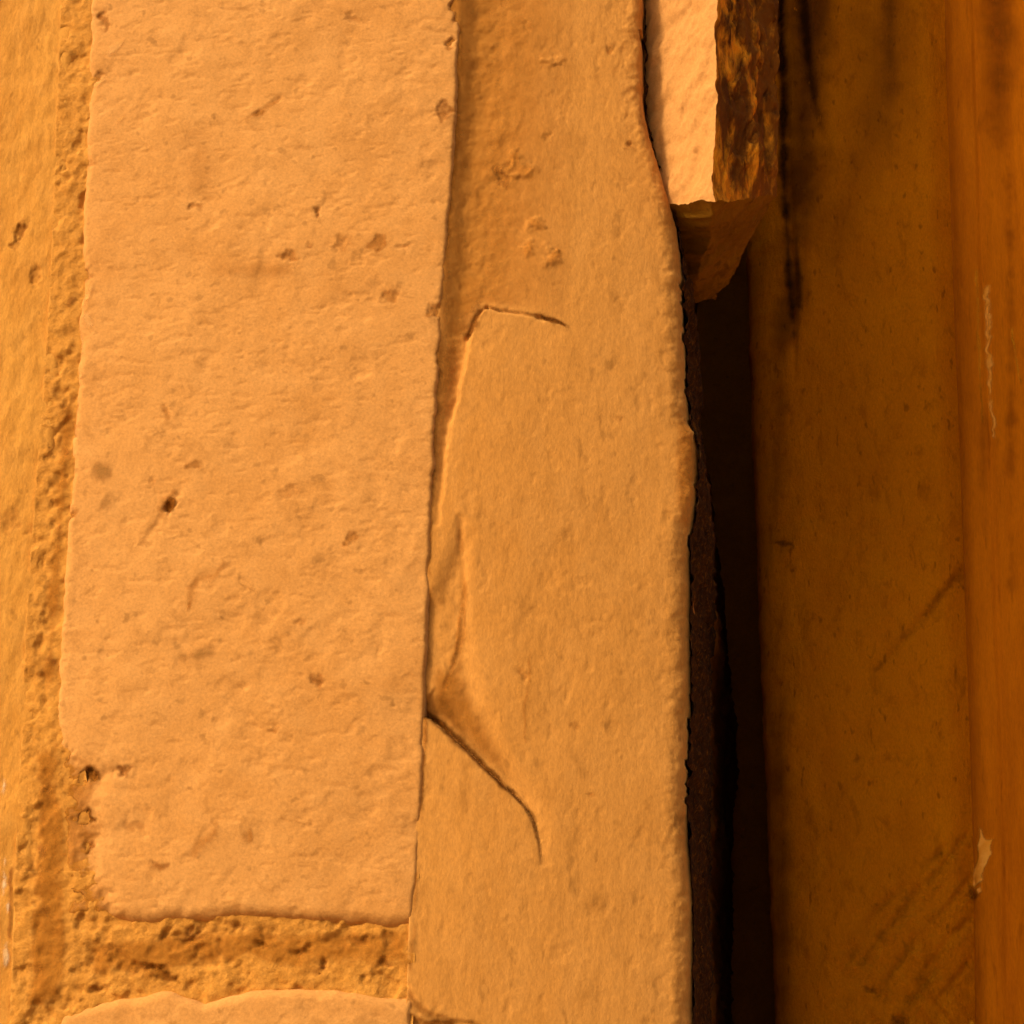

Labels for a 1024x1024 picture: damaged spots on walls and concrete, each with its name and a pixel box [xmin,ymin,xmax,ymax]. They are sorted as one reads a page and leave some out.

damp [789,0,826,207]
crack [424,715,529,811]